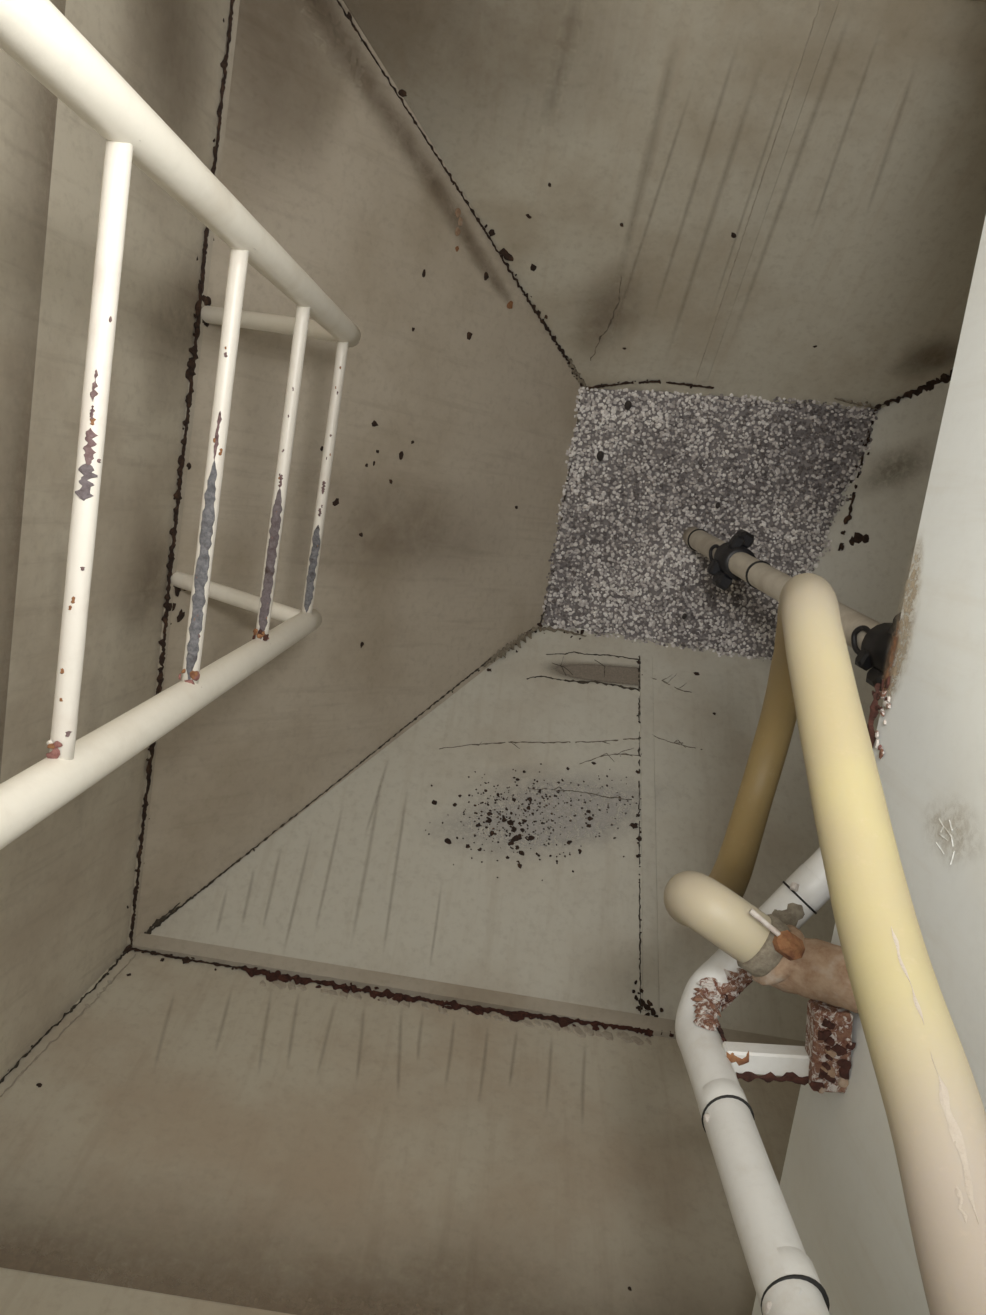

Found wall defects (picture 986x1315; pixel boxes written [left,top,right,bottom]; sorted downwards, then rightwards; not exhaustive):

rust [867,554,919,759]